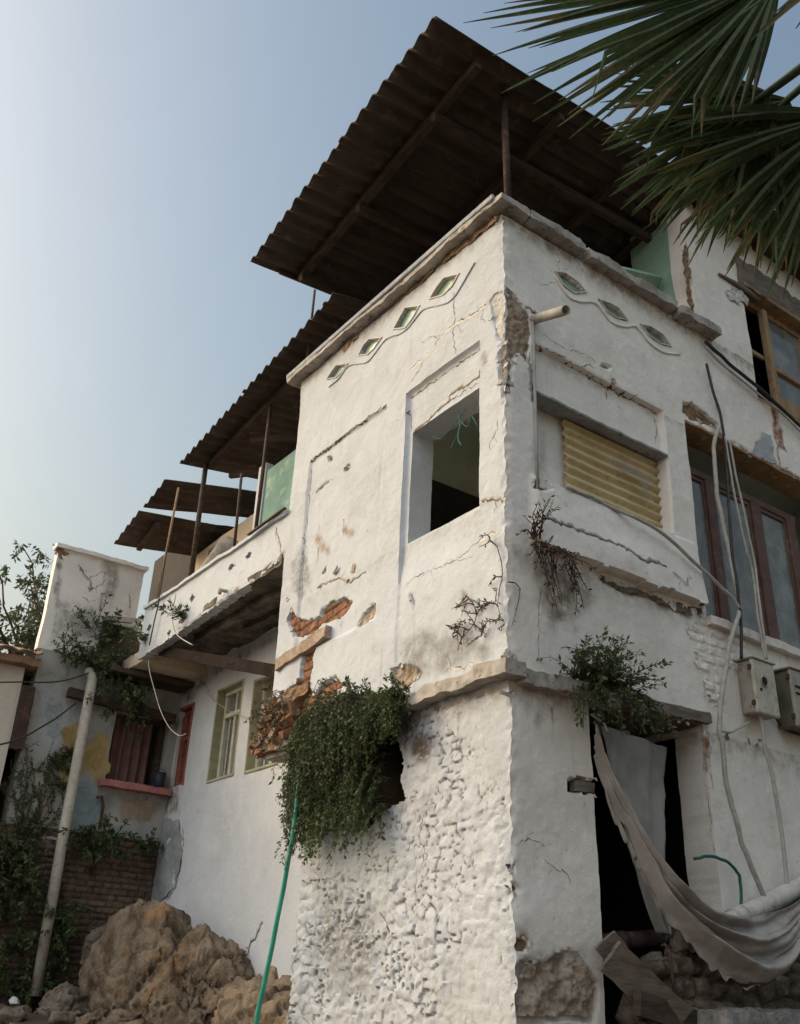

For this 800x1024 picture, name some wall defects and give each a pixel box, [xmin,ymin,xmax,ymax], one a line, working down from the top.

spalling [681,244,694,312]
spalling [488,292,530,394]
crack [275,286,657,600]
spalling [682,405,718,428]
crack [77,565,106,601]
spalling [284,651,343,716]
spalling [285,597,352,637]
spalling [359,604,376,627]
spalling [390,664,423,688]
peeling [600,575,748,718]
peeling [151,817,182,902]
spalling [511,936,597,1018]